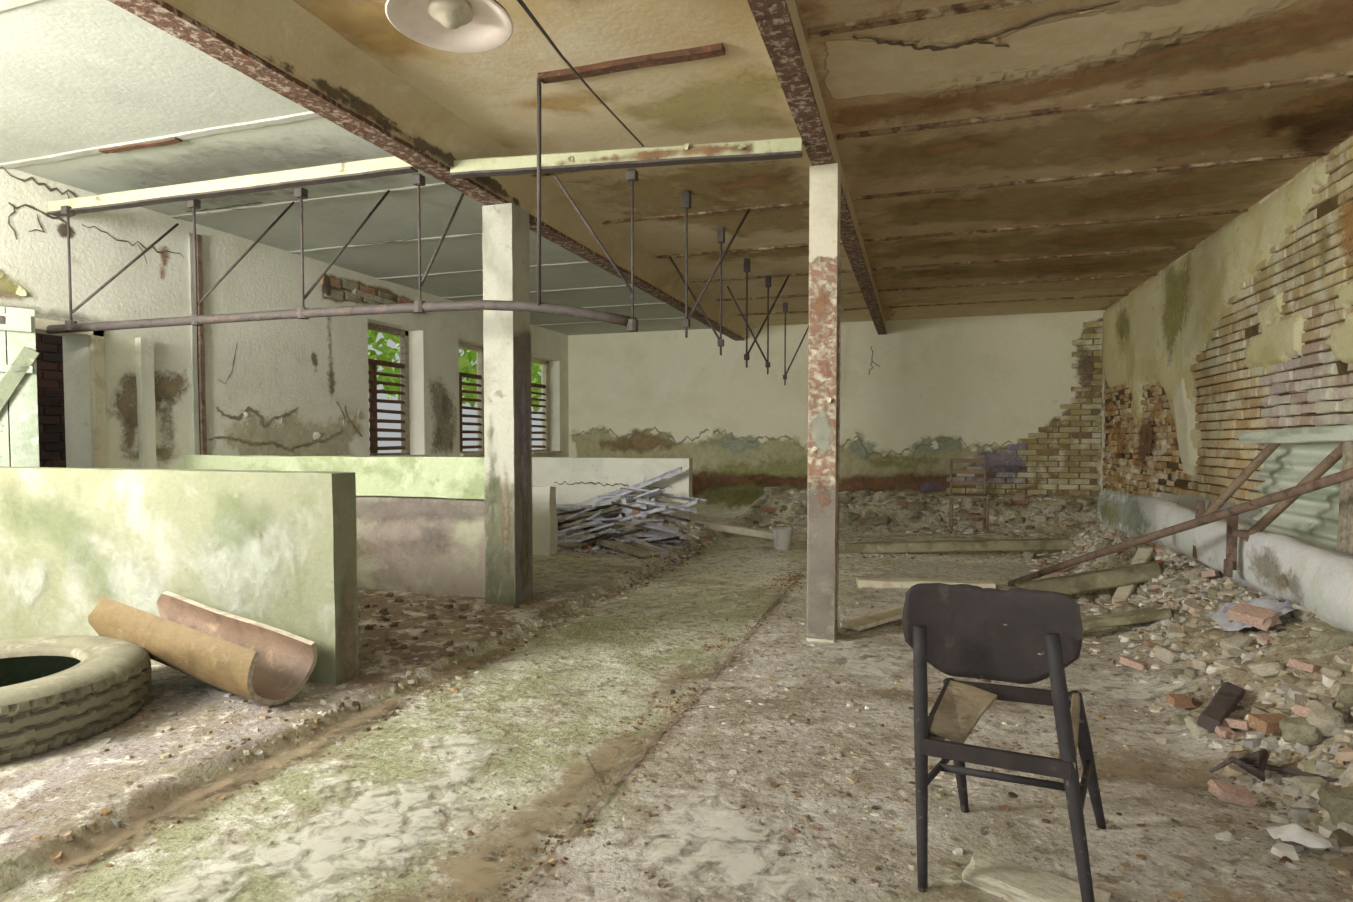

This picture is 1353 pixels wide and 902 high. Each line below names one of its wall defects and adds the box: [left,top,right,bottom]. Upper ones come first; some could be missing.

leakage [837,0,1353,125]
crack [0,167,182,262]
leakage [863,83,1353,279]
peeling [571,162,1329,504]
peeling [1324,281,1353,364]
peeling [209,401,363,456]